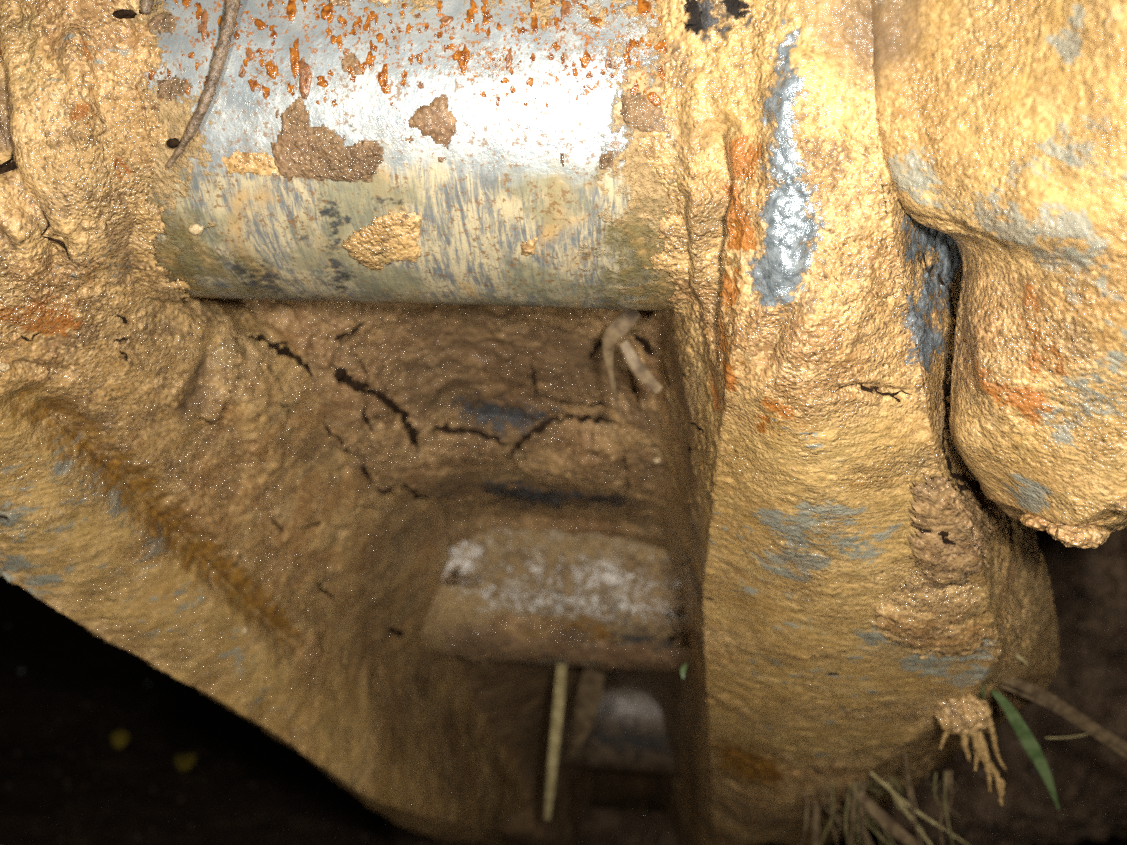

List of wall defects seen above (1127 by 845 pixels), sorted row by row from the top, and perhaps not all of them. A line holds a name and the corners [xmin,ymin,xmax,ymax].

corrosion [148,0,668,109]
peeling [682,0,752,47]
corrosion [716,145,768,408]
crack [918,252,956,327]
crack [634,335,654,356]
crack [247,323,640,512]
crack [832,383,912,402]
crack [942,357,983,500]
crack [272,521,323,531]
crack [910,524,976,548]
damp [442,540,684,653]